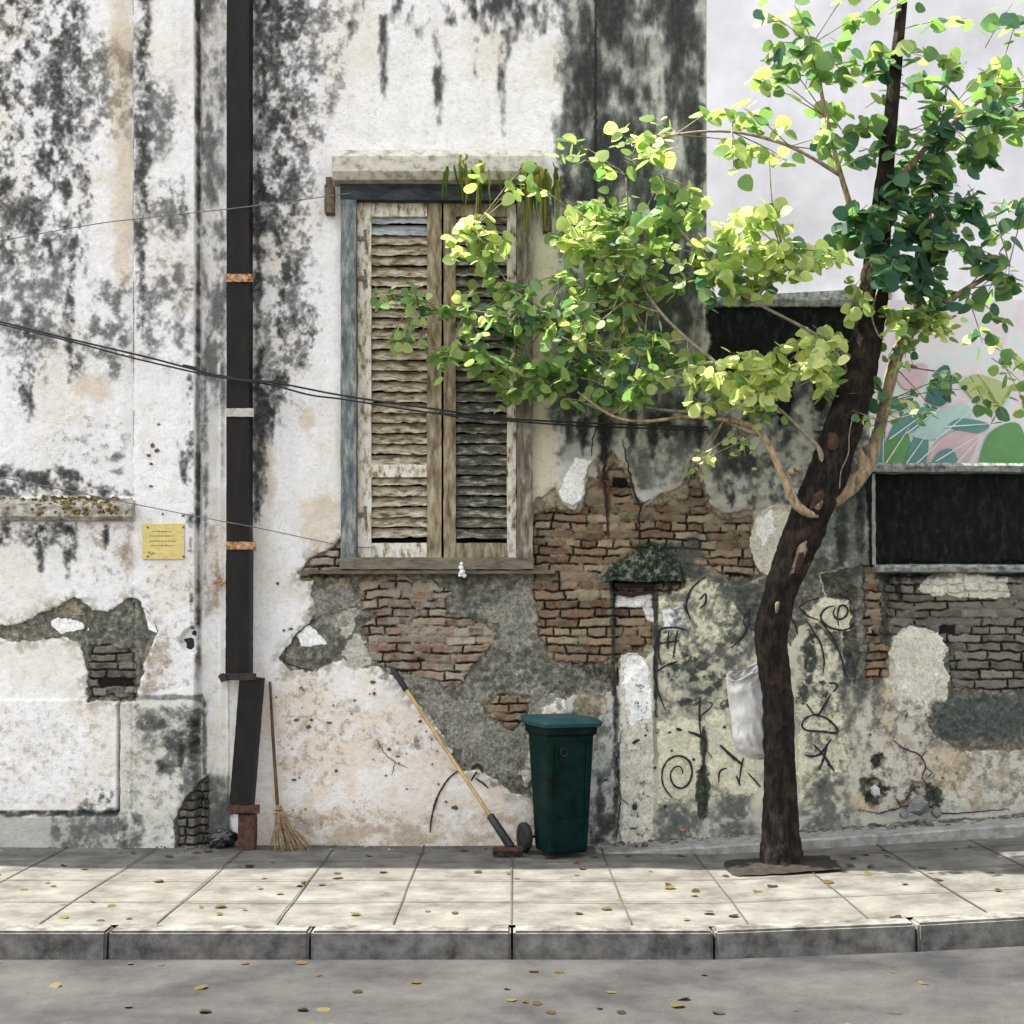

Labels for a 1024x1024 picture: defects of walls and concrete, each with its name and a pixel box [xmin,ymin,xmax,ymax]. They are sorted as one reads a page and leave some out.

water stain [378,0,413,92]
water stain [432,54,443,104]
water stain [0,0,227,540]
water stain [253,0,364,521]
water stain [446,0,853,509]
flaking render [0,597,158,703]
water stain [135,706,231,839]
flaking render [173,776,210,848]
flaking render [279,451,791,843]
water stain [588,688,755,845]
flaking render [788,558,1024,800]
water stain [795,620,1024,830]